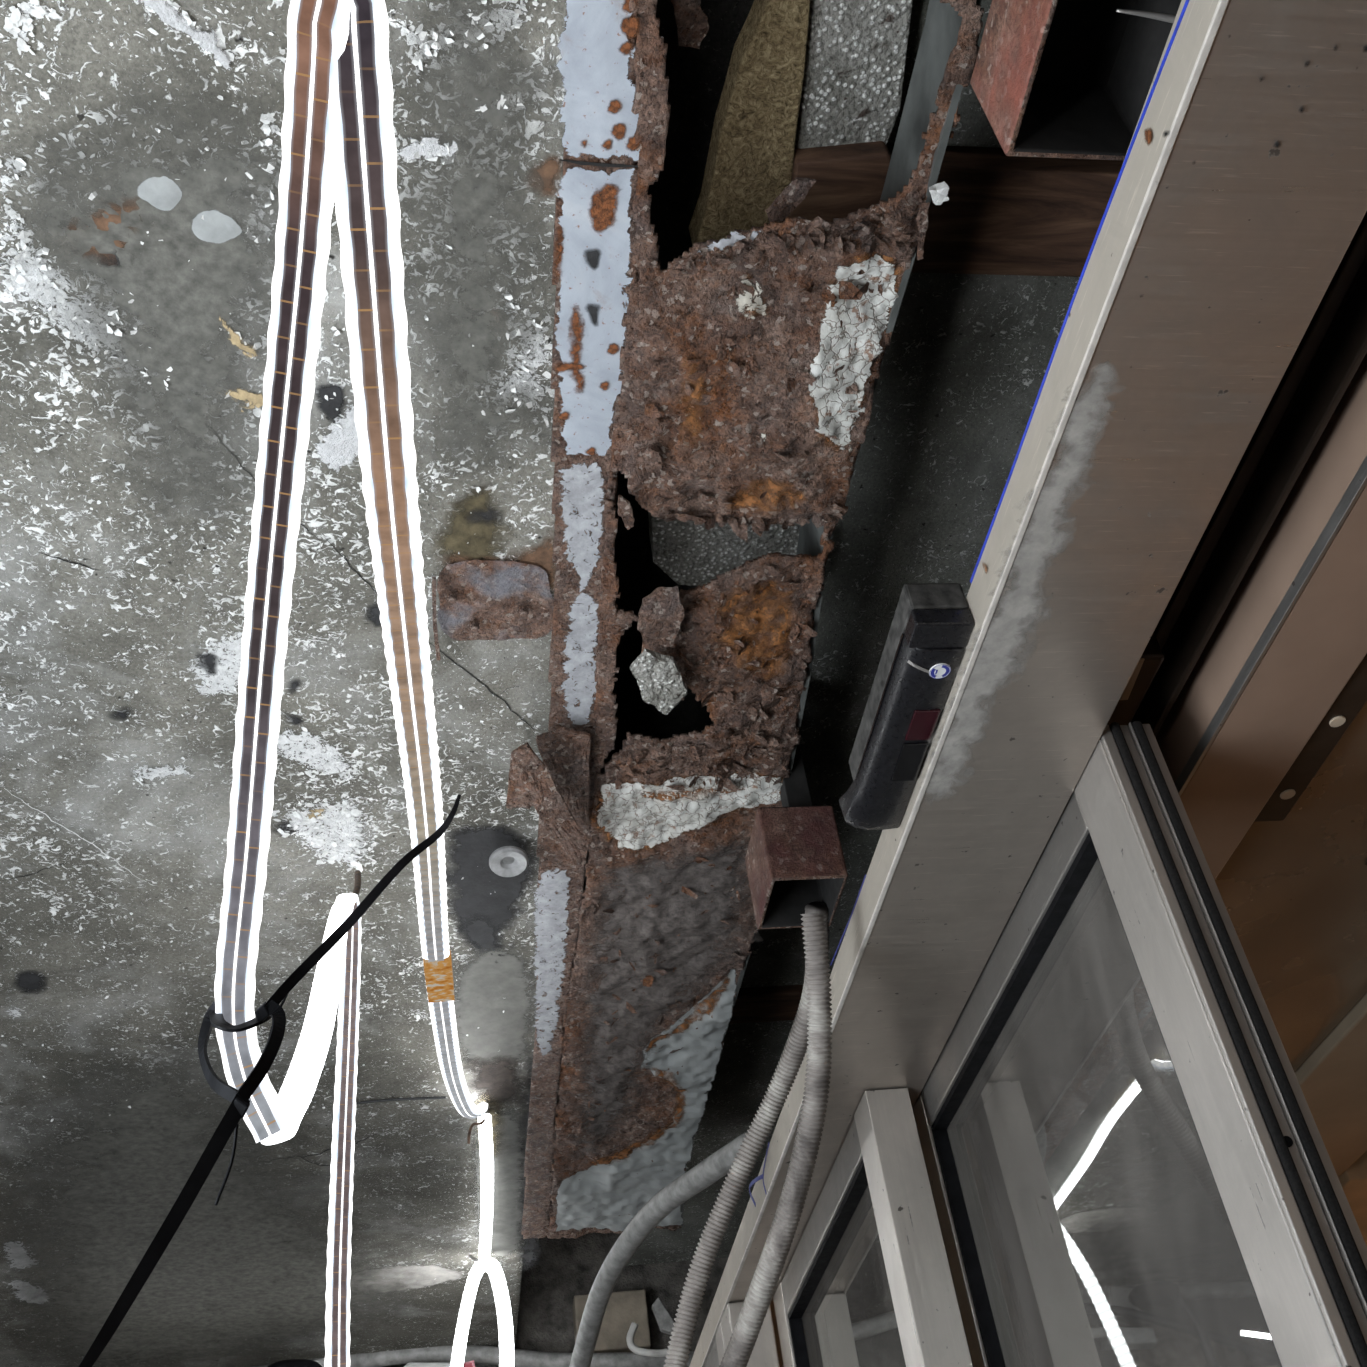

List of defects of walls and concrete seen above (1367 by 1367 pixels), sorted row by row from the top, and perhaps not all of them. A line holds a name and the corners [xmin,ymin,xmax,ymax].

corrosion [619,0,639,55]
corrosion [581,100,640,151]
corrosion [589,184,619,232]
peeling [697,229,762,254]
corrosion [646,177,949,277]
corrosion [787,270,883,327]
corrosion [556,308,609,393]
corrosion [632,284,879,542]
corrosion [617,495,634,530]
damp [925,365,1113,796]
corrosion [614,563,818,792]
corrosion [563,844,750,1166]